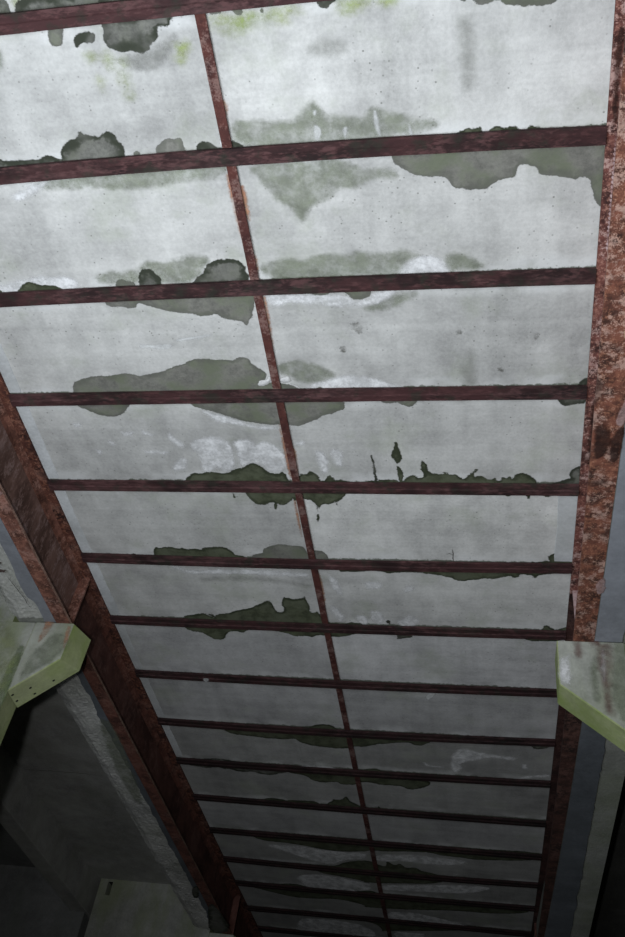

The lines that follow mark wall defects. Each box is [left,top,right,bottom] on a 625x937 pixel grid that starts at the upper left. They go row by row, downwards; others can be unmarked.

damp [236,105,412,145]
damp [265,160,356,218]
peeling [258,376,301,389]